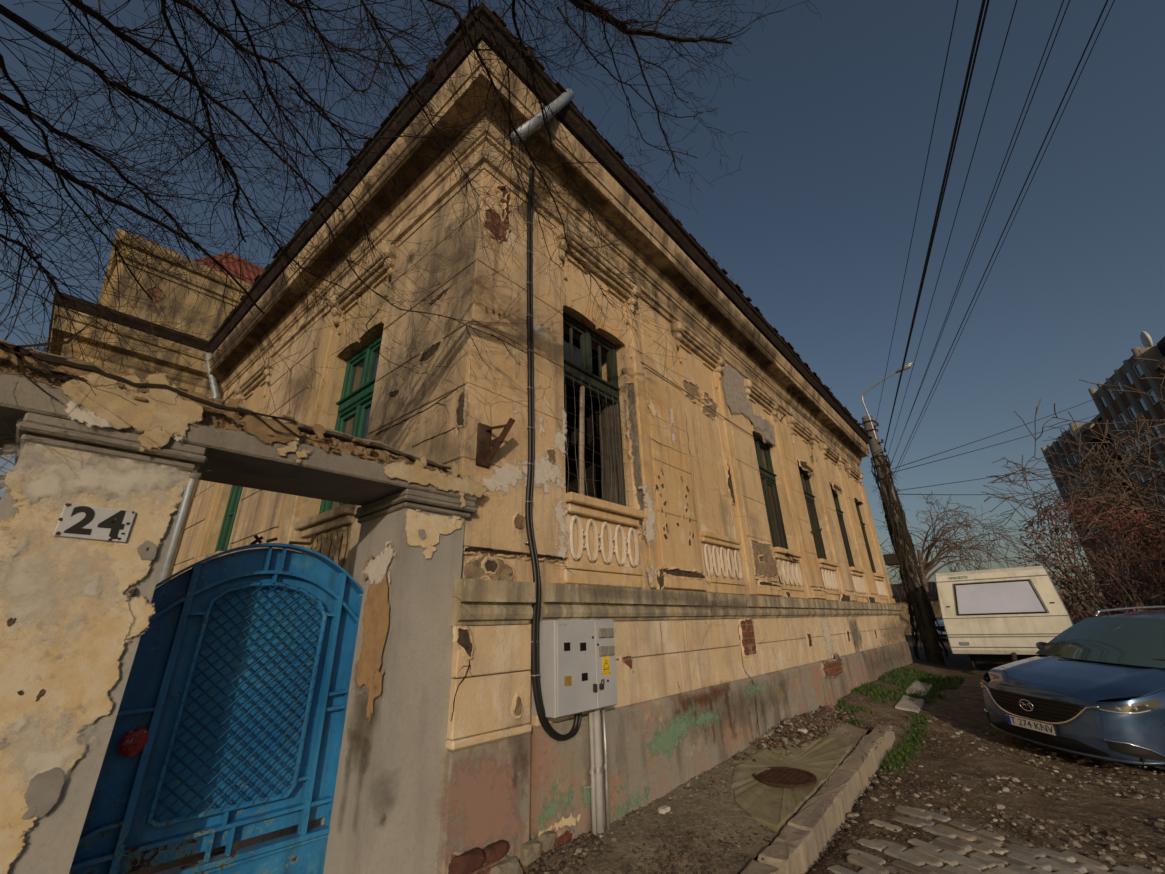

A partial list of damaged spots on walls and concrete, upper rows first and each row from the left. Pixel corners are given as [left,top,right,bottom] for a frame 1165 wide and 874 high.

flaking render [481,184,512,244]
flaking render [681,365,776,446]
flaking render [276,404,571,581]
peeling [622,364,694,547]
flaking render [0,353,248,874]
flaking render [356,540,395,722]
flaking render [452,625,476,661]
flaking render [738,618,758,658]
flaking render [820,653,845,679]